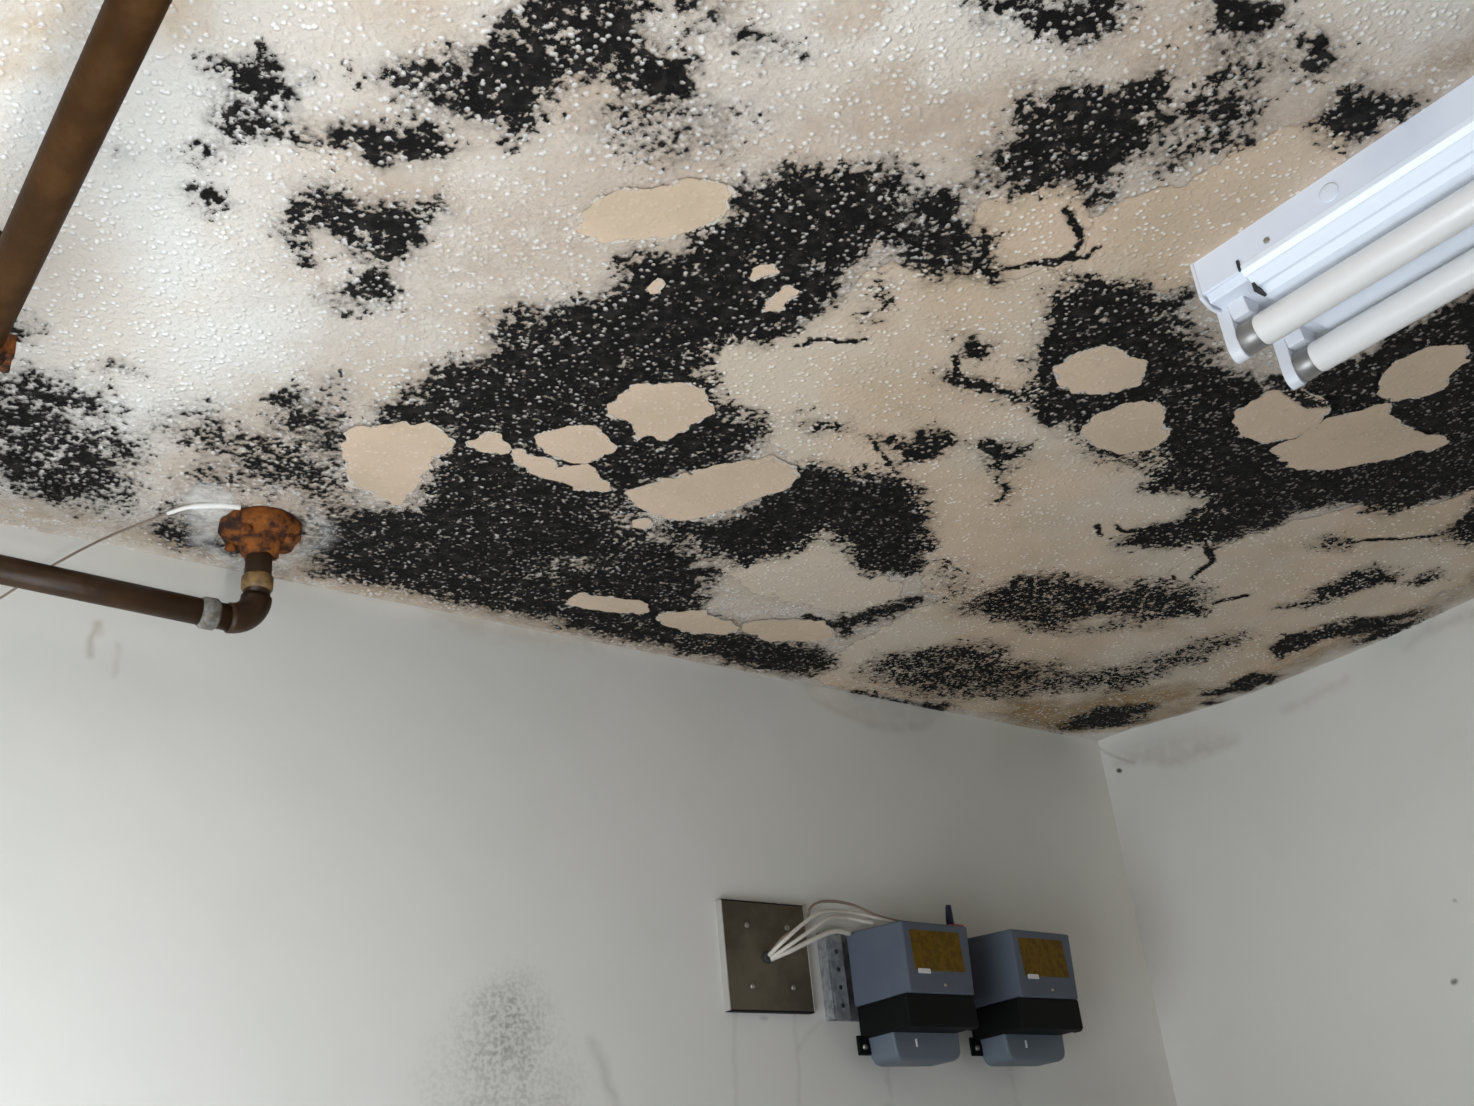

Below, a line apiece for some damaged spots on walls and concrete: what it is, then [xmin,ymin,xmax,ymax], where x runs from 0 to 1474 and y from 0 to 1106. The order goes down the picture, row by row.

leakage [0,0,1474,734]
peeling [339,115,1474,732]